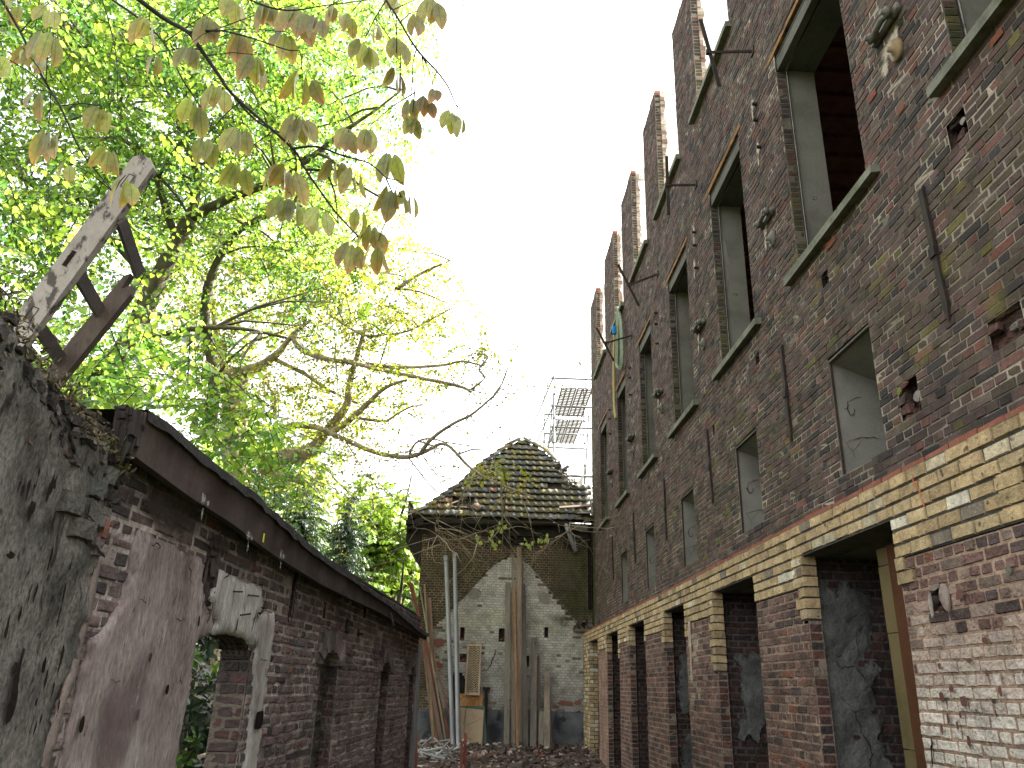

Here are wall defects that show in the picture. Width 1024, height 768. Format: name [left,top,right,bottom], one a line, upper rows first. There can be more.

spalling [942,103,969,151]
spalling [985,301,1024,354]
spalling [0,312,126,576]
crack [845,397,880,455]
spalling [897,375,924,426]
flaking render [0,583,38,639]
flaking render [198,535,221,627]
spalling [928,583,964,619]
flaking render [6,648,25,724]
flaking render [32,645,65,738]
peeling [939,685,971,748]